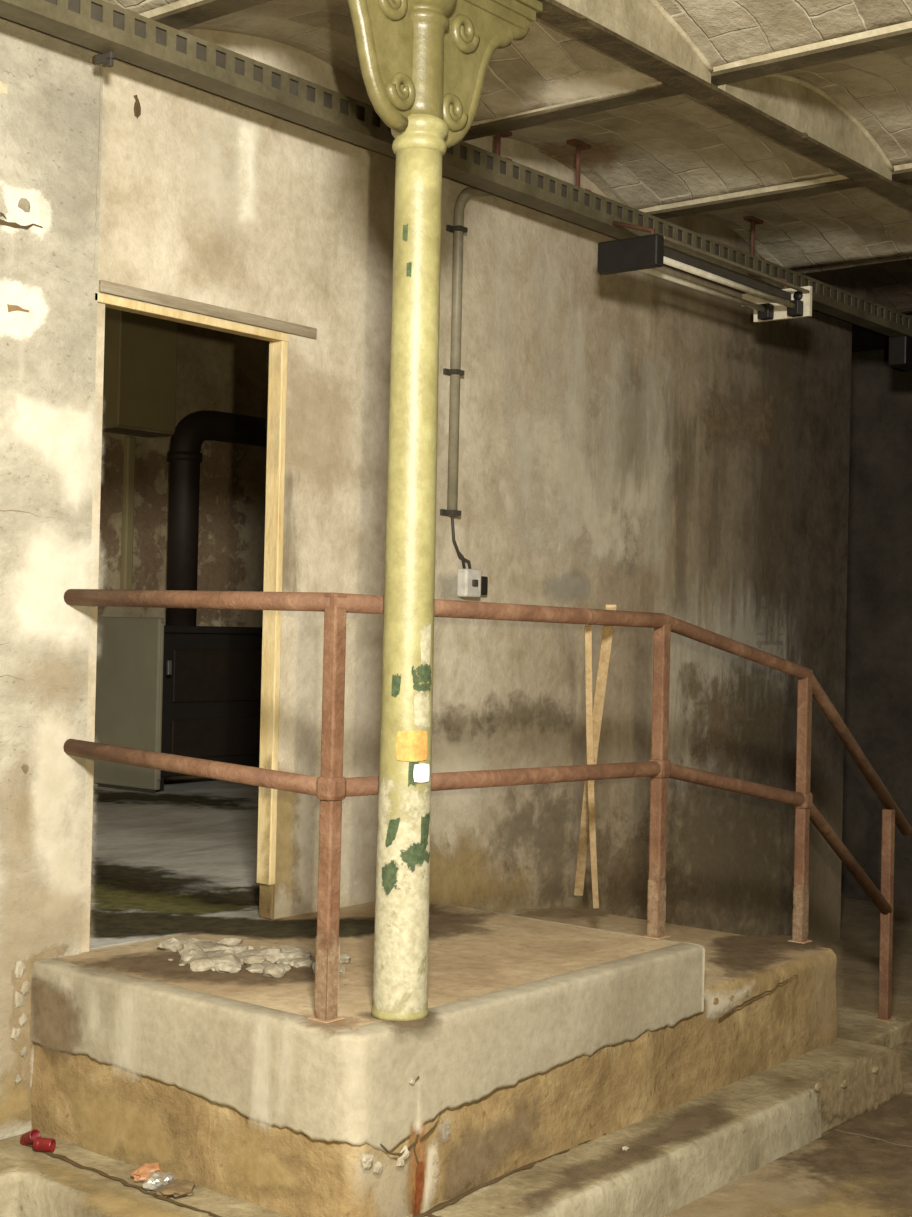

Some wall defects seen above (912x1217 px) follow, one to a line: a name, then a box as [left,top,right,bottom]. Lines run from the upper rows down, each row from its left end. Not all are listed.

peeling [0,198,43,229]
peeling [343,630,355,777]
peeling [340,797,356,897]
peeling [372,623,484,1014]
spalling [705,989,749,1016]
corrosion [409,1105,426,1216]